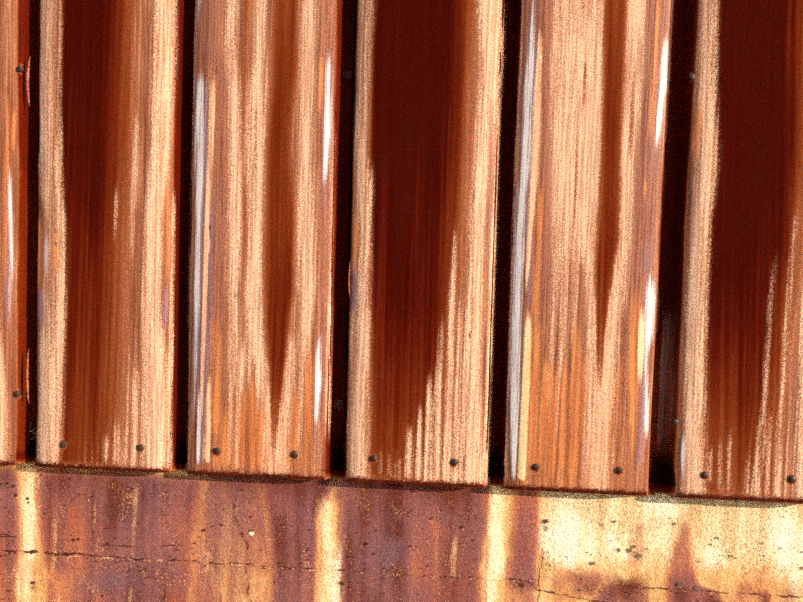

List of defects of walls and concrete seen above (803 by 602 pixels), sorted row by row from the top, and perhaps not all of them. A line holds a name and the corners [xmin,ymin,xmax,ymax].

corrosion [0,0,523,602]
crack [0,486,802,602]
corrosion [503,0,702,602]
corrosion [664,521,801,602]
corrosion [677,0,803,503]